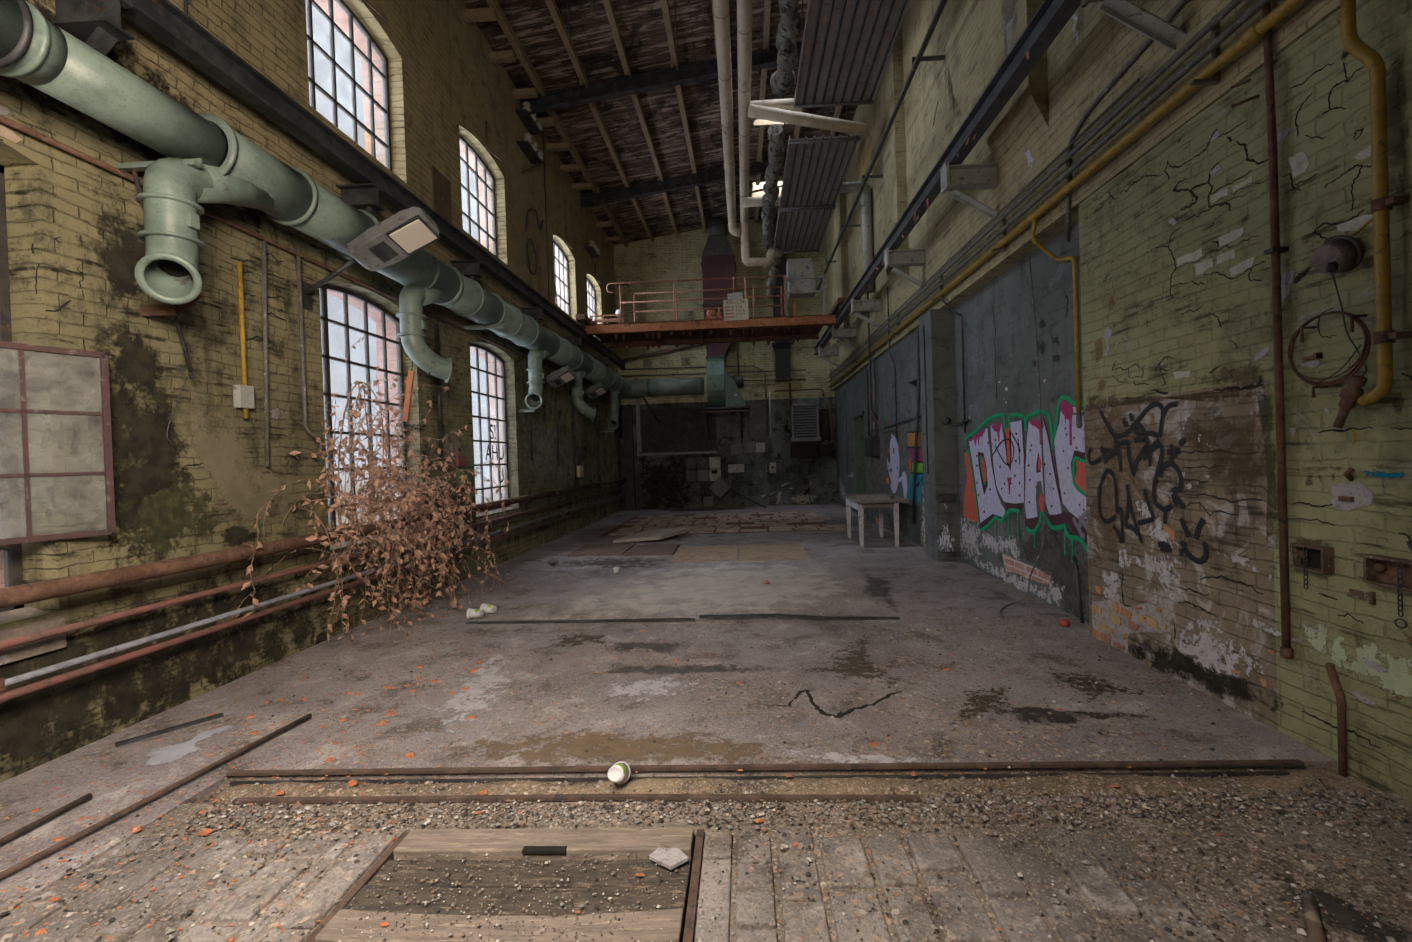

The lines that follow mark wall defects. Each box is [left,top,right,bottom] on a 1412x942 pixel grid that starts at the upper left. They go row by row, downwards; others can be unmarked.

flaking render [1288,151,1310,178]
crack [1108,60,1397,395]
flaking render [1336,214,1373,232]
flaking render [1177,227,1256,277]
water stain [69,323,194,563]
crack [1318,425,1412,433]
flaking render [1002,554,1051,585]
water stain [1217,551,1272,580]
flaking render [1091,585,1168,651]
water stain [1249,618,1281,637]
water stain [1169,616,1264,678]
crack [772,690,902,718]